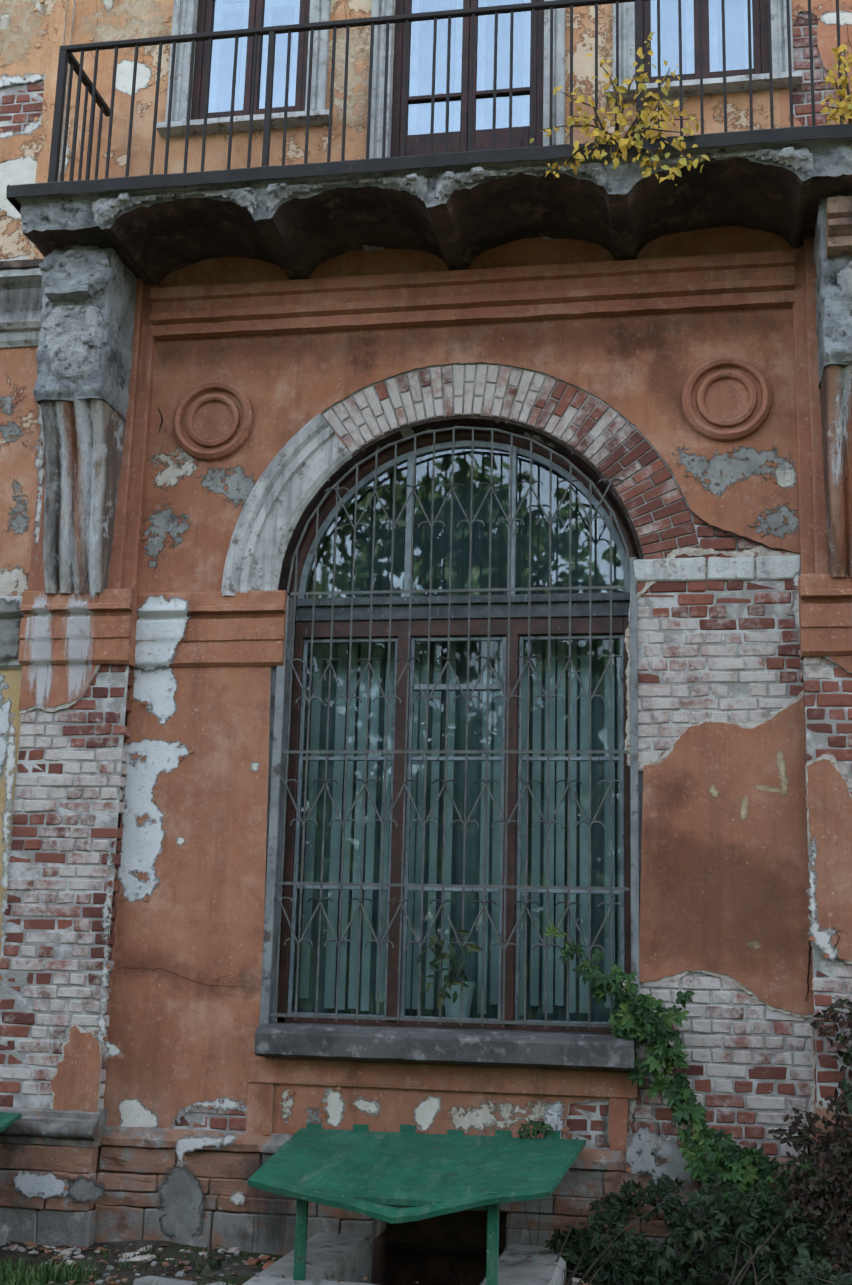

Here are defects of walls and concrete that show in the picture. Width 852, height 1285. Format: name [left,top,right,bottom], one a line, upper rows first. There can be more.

flaking render [0,0,47,139]
flaking render [792,10,852,126]
peeling [141,448,256,572]
flaking render [322,363,852,795]
flaking render [0,594,247,1169]
flaking render [413,837,852,1194]
peeling [277,1086,381,1127]
peeling [13,1170,70,1200]